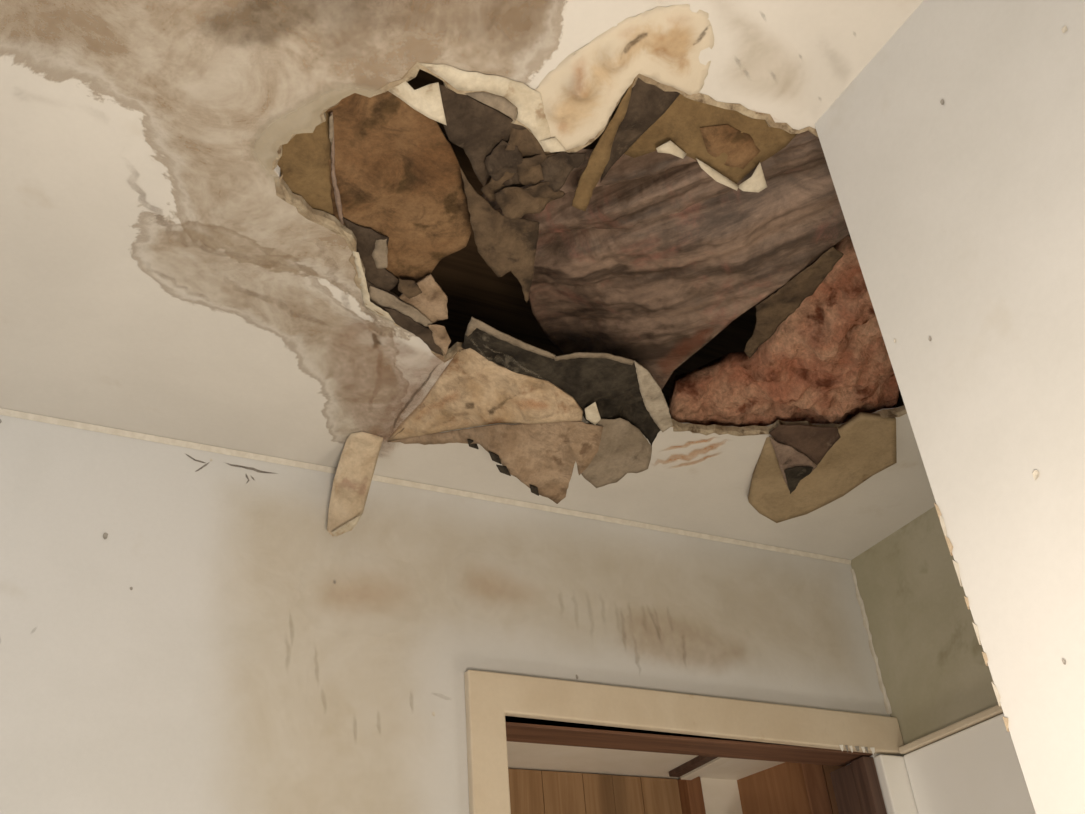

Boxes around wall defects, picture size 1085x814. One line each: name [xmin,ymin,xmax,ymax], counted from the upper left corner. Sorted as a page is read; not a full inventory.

water stain [0,0,549,231]
flaking render [254,89,373,177]
peeling [419,63,566,153]
water stain [281,292,397,403]
peeling [327,432,383,536]
peeling [467,439,511,476]
peeling [585,402,601,425]